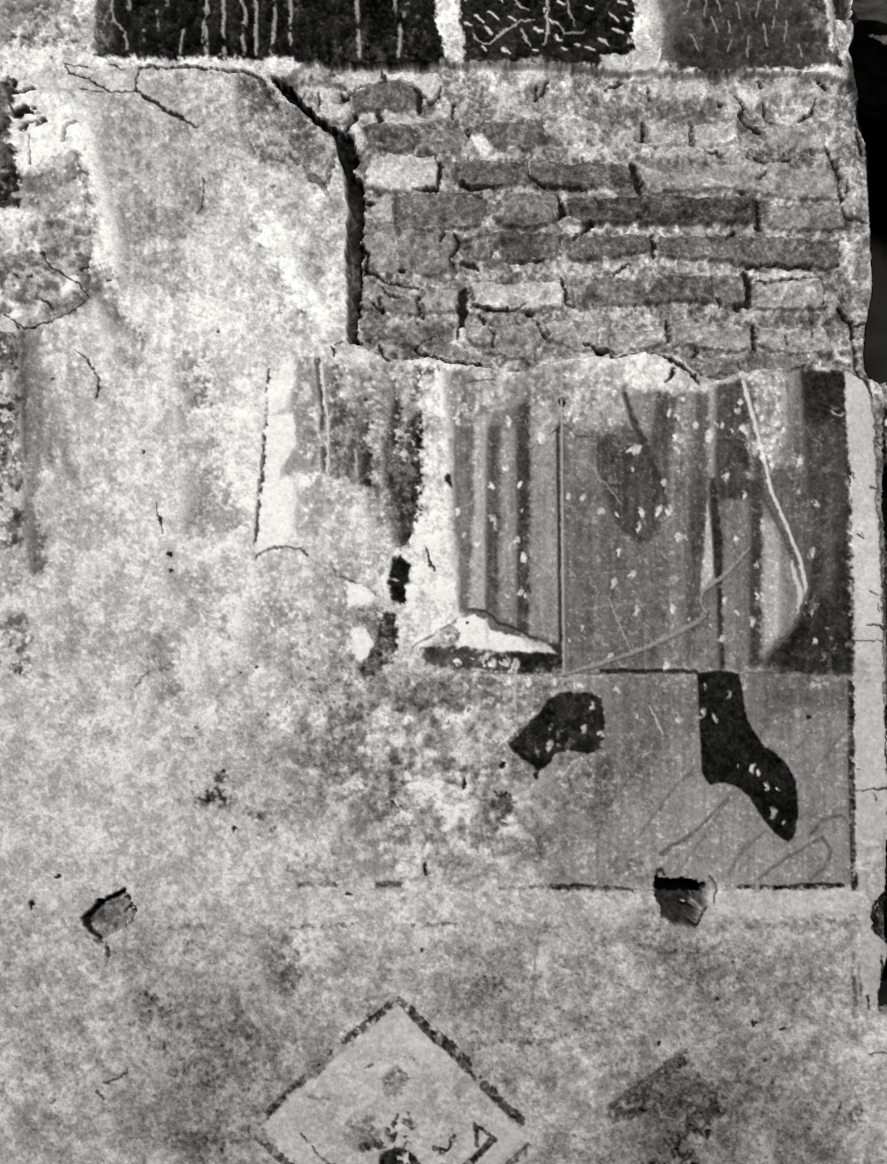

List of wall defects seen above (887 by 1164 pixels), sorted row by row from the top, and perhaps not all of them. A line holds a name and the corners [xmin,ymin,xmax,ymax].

flaking render [5,86,114,274]
crack [2,249,112,331]
crack [63,62,752,677]
flaking render [227,18,887,706]
peeling [452,649,535,738]
peeling [572,679,606,738]